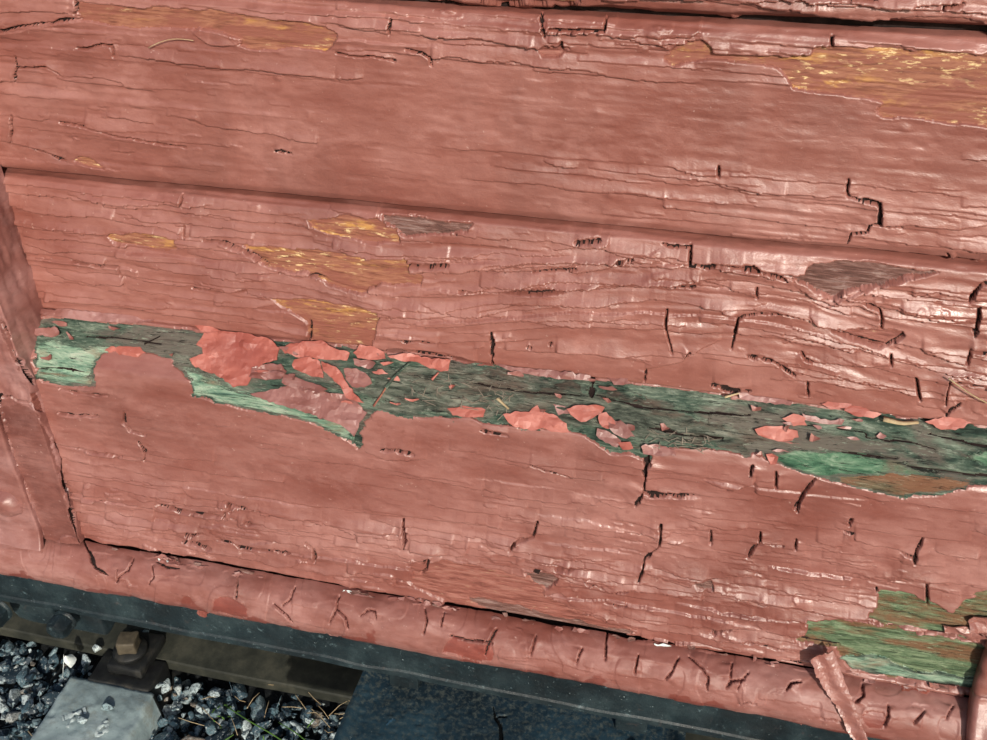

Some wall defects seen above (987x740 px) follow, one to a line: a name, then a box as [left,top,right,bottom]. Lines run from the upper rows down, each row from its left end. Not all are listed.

peeling [76,2,338,56]
peeling [665,40,987,133]
crack [846,178,883,244]
peeling [30,392,42,411]
peeling [32,209,987,499]
crack [474,332,751,439]
crack [663,242,716,357]
crack [732,265,809,394]
crack [837,281,987,477]
crack [634,455,695,505]
crack [638,524,662,582]
peeling [791,590,987,740]